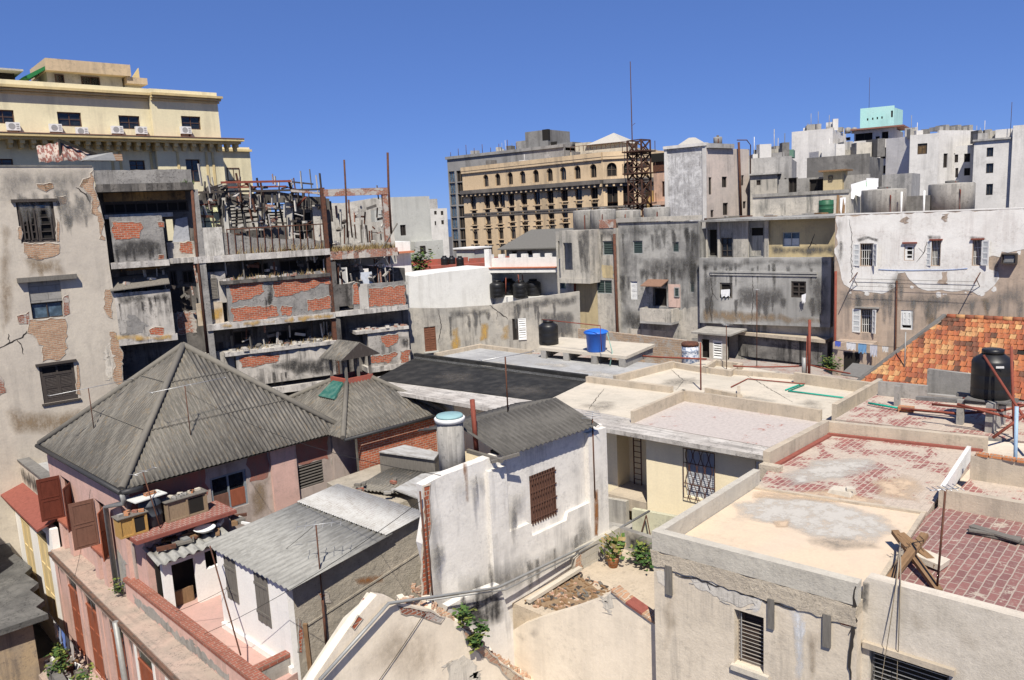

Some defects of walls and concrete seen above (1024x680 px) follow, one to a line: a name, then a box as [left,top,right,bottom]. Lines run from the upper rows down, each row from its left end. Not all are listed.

flaking render [79,171,144,241]
flaking render [17,218,61,260]
peeling [834,209,1024,298]
crack [0,331,27,353]
flaking render [17,295,70,362]
flaking render [102,289,164,385]
water stain [449,311,490,349]
water stain [505,298,574,337]
water stain [643,265,791,322]
flaking render [396,483,531,680]
water stain [462,561,538,605]
flaking render [686,575,762,609]